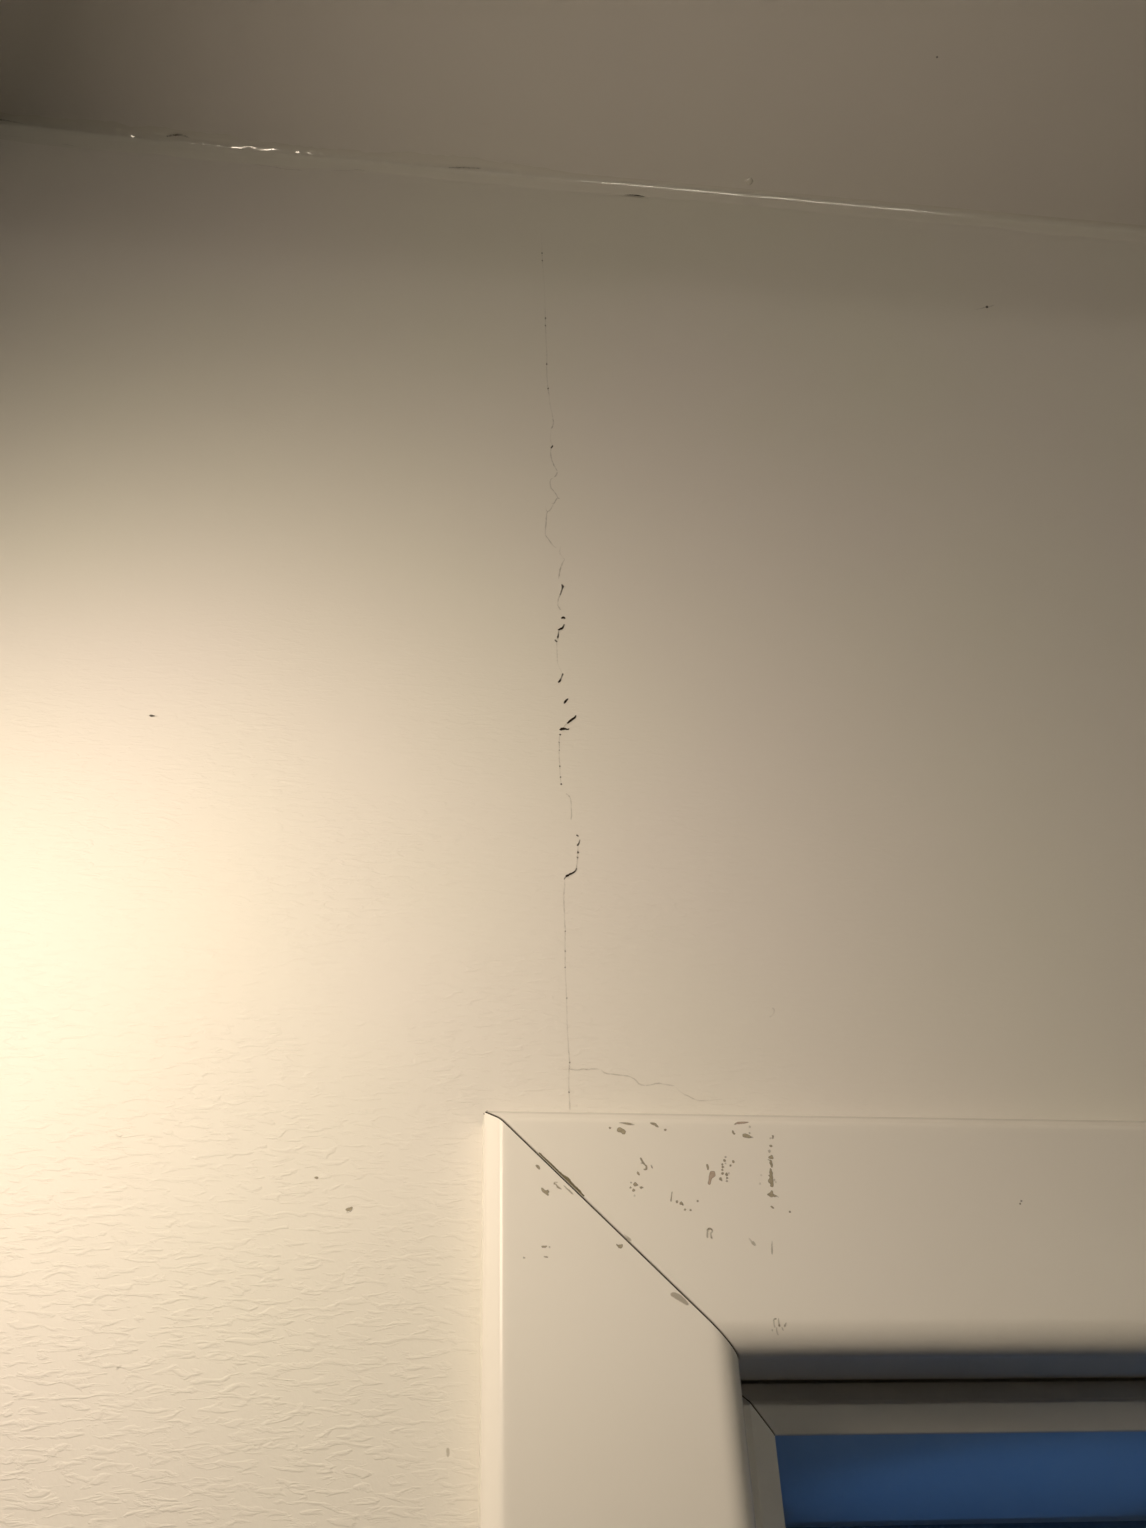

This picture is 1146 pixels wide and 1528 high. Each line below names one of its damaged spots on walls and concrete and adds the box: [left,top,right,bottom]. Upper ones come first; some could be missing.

crack [555,584,576,785]
peeling [536,1152,584,1197]
peeling [767,1135,791,1213]